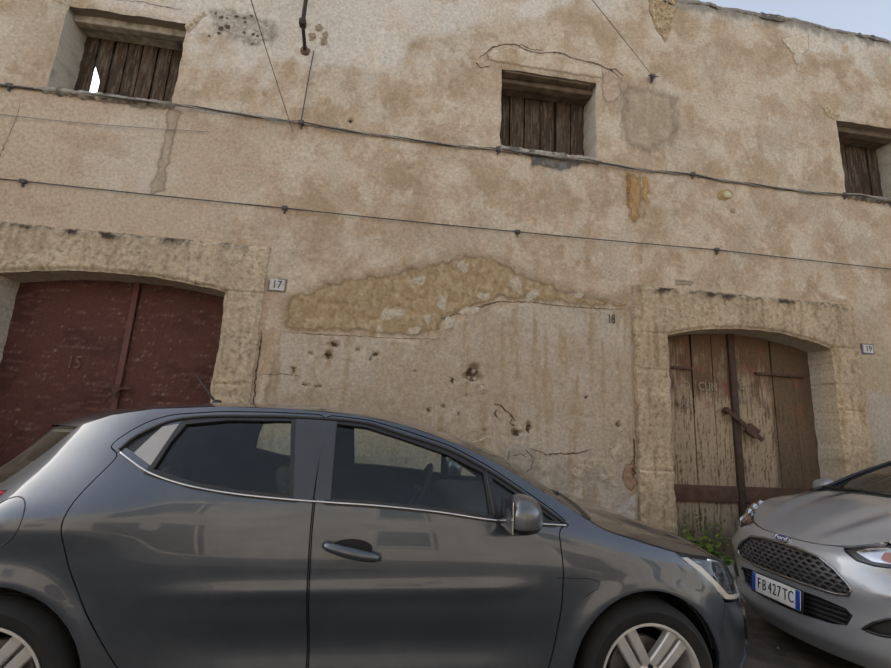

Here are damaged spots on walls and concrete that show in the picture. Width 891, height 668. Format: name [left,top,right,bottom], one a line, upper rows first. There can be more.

spalling [648,0,677,42]
crack [476,43,623,82]
flaking render [285,256,625,336]
crack [494,404,516,426]
crack [532,448,592,456]